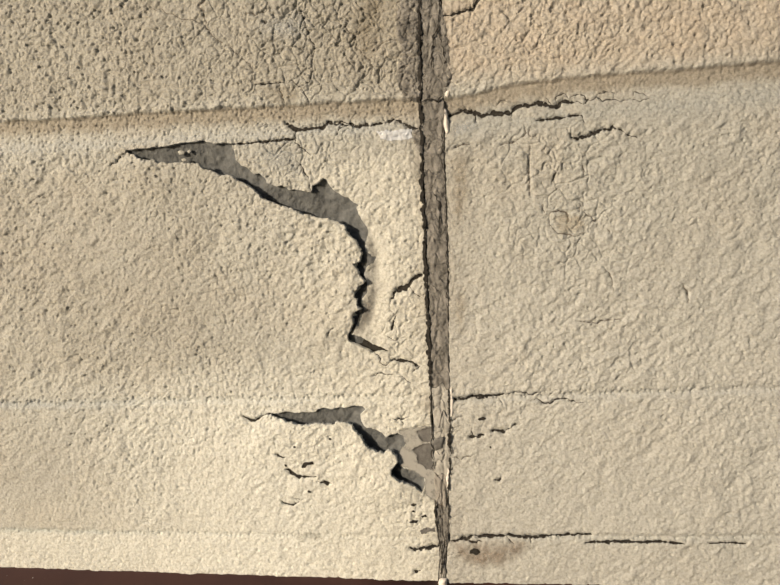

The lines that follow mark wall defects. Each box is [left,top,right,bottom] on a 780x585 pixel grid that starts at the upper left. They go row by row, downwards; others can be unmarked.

spalling [128,141,388,352]
crack [153,0,684,574]
spalling [271,406,447,500]